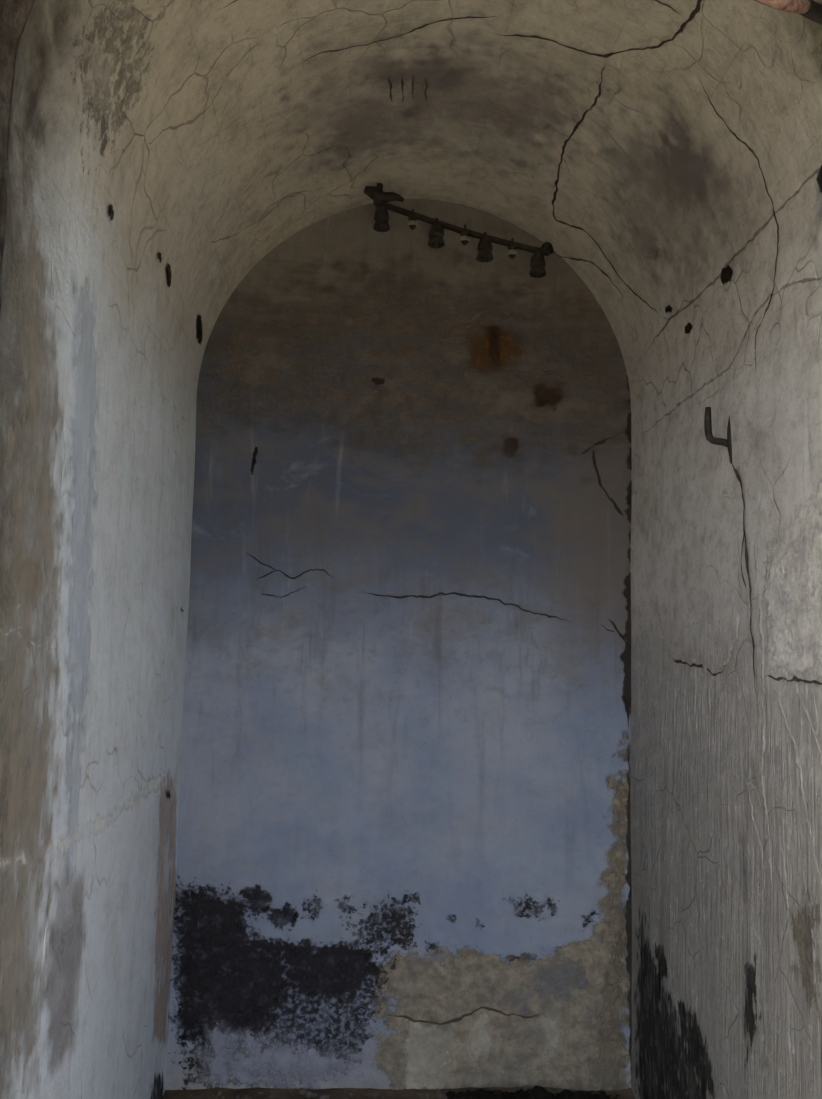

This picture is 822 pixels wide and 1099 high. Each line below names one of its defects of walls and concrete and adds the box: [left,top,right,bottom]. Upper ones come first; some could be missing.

crack [304,0,702,317]
crack [701,83,779,368]
rust [471,325,523,371]
rust [533,384,562,411]
crack [246,553,333,598]
crack [368,592,568,621]
peeling [371,776,630,1091]
leakage [505,894,559,918]
leakage [582,732,714,1099]
leakage [151,877,436,1099]
crack [389,1006,554,1025]